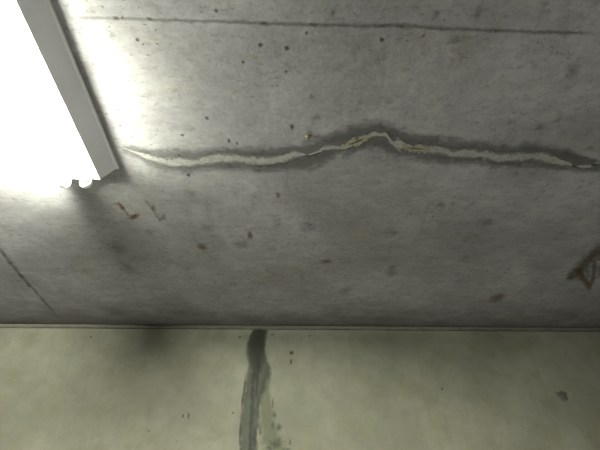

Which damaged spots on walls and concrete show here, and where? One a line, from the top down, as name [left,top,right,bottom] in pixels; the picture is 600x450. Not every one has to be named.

crack [116,131,600,168]
water stain [239,329,281,450]